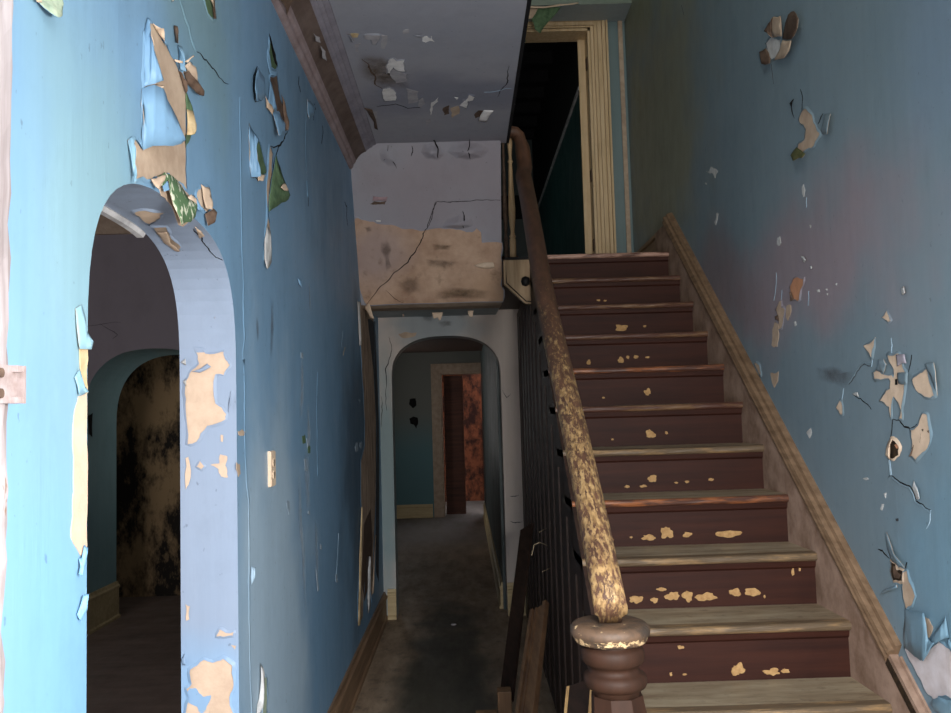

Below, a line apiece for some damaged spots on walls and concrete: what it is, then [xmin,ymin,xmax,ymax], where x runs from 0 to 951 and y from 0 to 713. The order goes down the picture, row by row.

peeling [127,18,217,252]
peeling [249,34,290,270]
crack [369,198,501,303]
peeling [70,305,94,576]
peeling [181,347,232,488]
spalling [354,217,505,626]
crack [848,361,871,409]
peeling [863,337,938,475]
crack [887,475,931,529]
peeling [77,594,89,620]
peeling [181,627,237,713]
peeling [878,532,951,713]